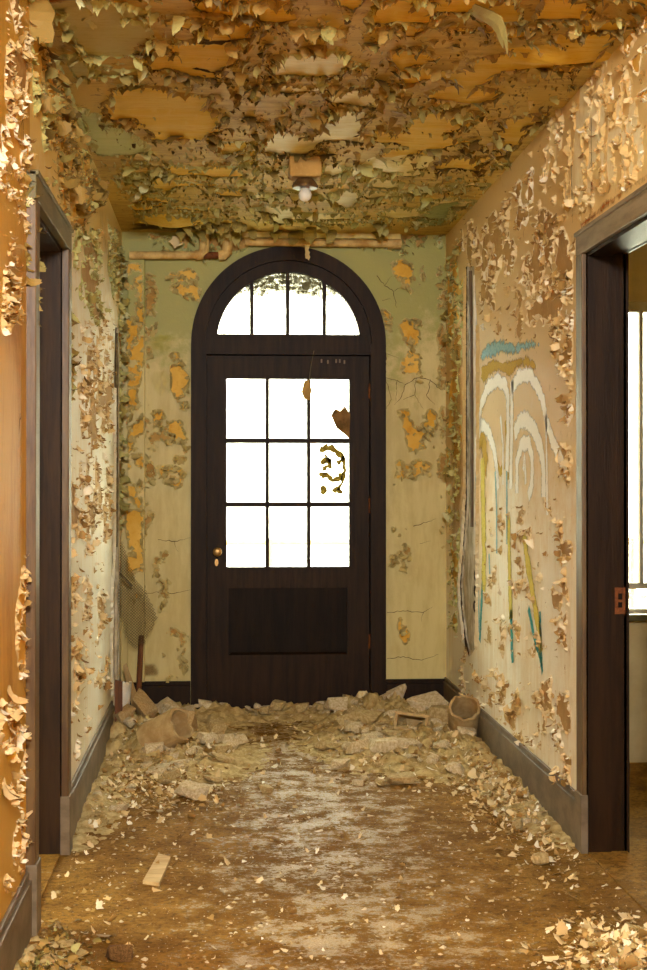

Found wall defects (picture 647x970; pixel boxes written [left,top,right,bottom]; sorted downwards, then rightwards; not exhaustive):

peeling [0,0,647,753]
crack [386,354,441,408]
crack [460,267,469,655]
peeling [73,714,92,762]
peeling [549,753,572,787]